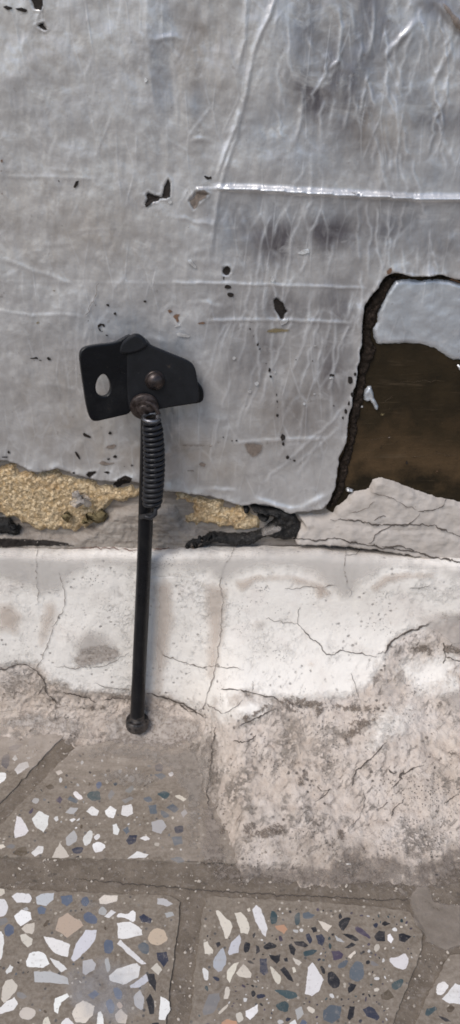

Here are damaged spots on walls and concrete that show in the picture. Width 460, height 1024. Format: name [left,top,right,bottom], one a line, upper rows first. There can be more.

peeling [145,180,172,207]
peeling [333,373,384,419]
spalling [0,451,139,532]
spalling [176,492,281,530]
crack [268,492,460,698]
crack [0,549,282,832]
crack [299,742,424,827]